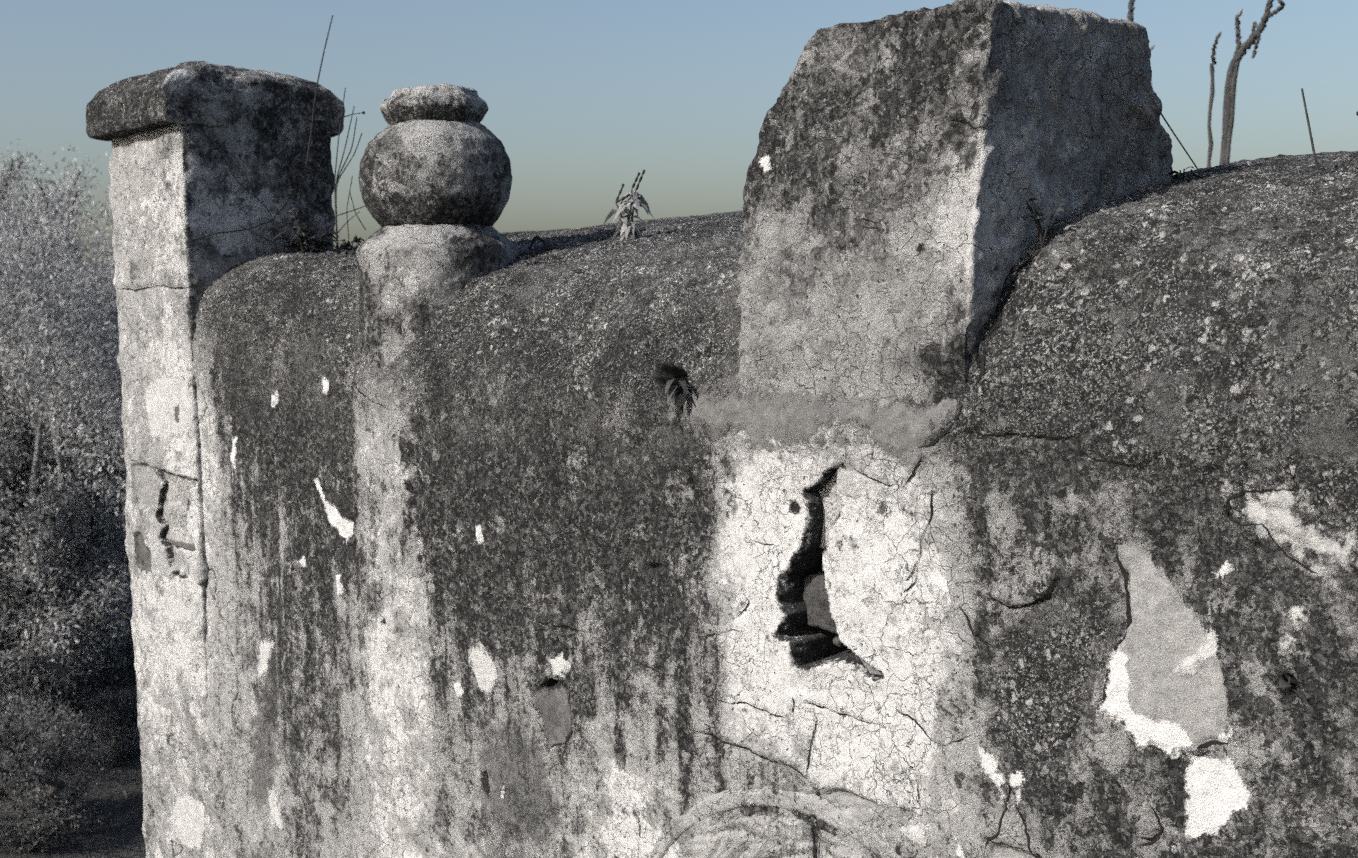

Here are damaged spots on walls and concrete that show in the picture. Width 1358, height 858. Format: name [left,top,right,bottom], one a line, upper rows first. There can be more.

spalling [130,462,209,632]
flaking render [803,571,883,676]
flaking render [837,469,886,515]
flaking render [1096,542,1253,838]
crack [692,697,970,858]